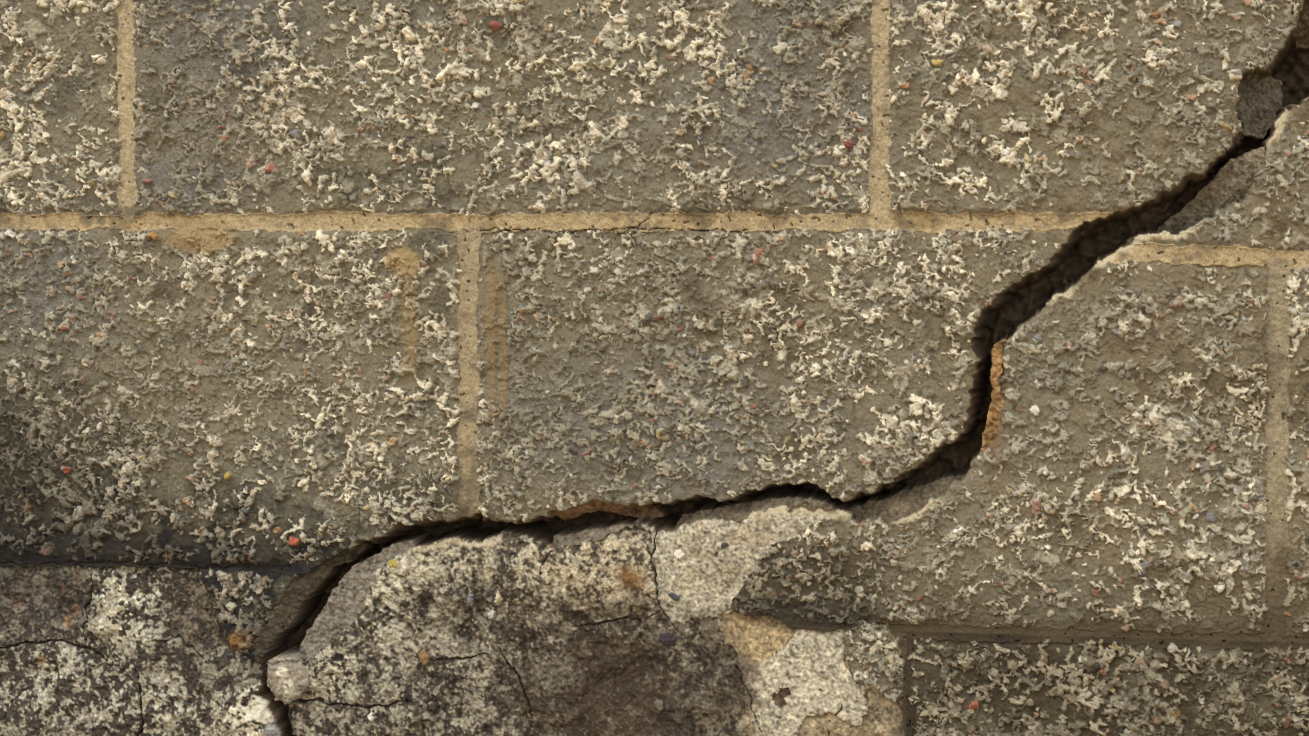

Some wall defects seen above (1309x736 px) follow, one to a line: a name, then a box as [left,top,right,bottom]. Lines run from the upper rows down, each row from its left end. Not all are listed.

crack [466,213,749,235]
crack [639,0,1309,533]
crack [253,500,671,736]
crack [651,545,678,631]